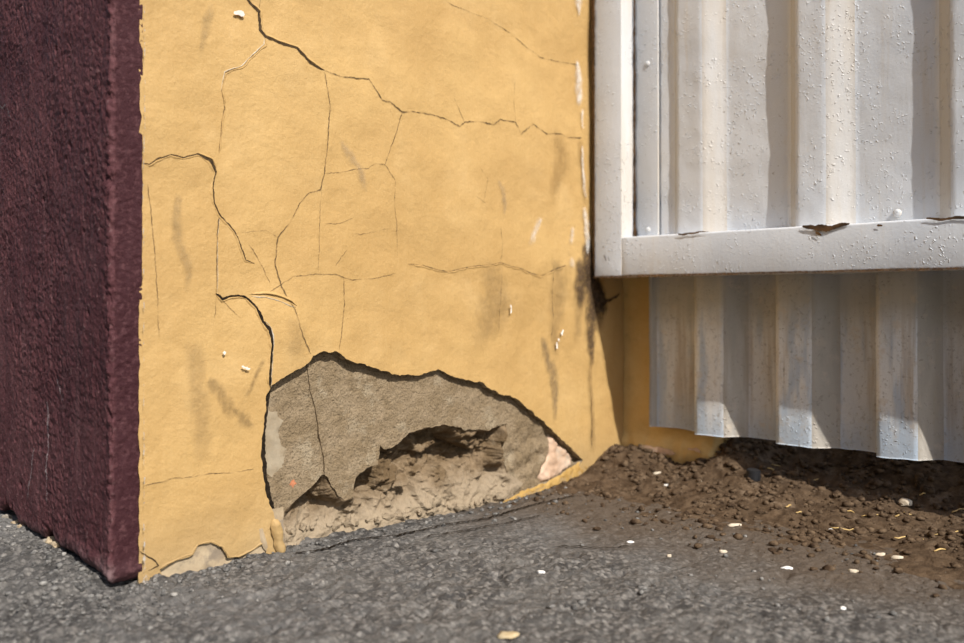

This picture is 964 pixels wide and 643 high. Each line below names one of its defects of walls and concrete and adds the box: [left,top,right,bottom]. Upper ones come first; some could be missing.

crack [145,0,581,509]
corrosion [802,223,849,236]
flaking render [261,351,587,547]
peeling [160,540,267,578]